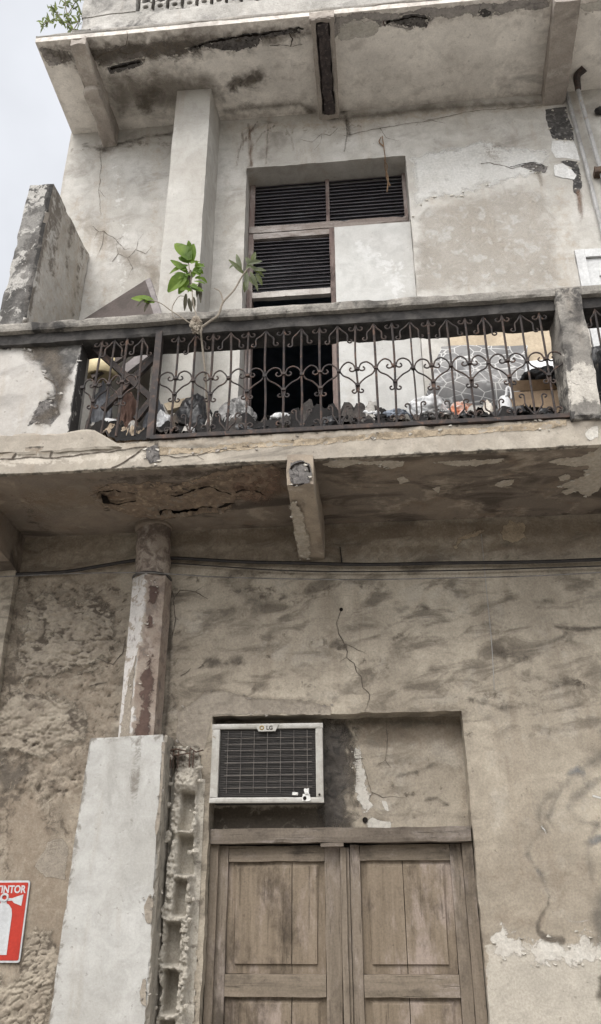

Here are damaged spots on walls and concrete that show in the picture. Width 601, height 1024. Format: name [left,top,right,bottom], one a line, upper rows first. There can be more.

peeling [334,0,549,41]
damp [90,28,277,65]
damp [111,73,207,111]
damp [228,71,263,91]
peeling [545,107,574,142]
crack [93,226,149,278]
peeling [22,344,83,426]
crack [336,611,370,710]
rust [132,655,155,736]
spalling [136,690,391,1024]
damp [536,901,564,943]
peeling [490,923,601,967]